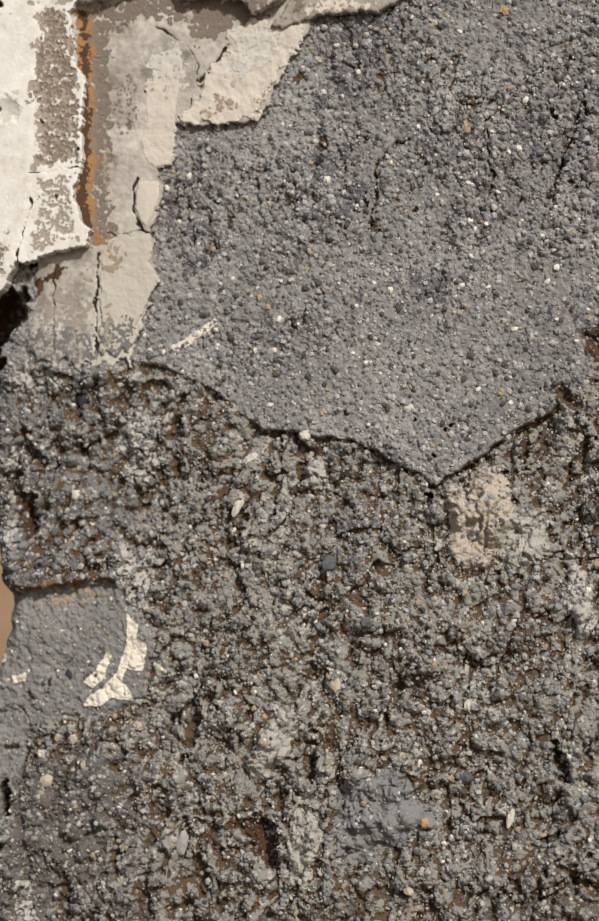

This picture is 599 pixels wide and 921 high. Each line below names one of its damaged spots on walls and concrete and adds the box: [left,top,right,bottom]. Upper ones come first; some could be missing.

peeling [135,181,160,226]
spalling [0,229,599,921]